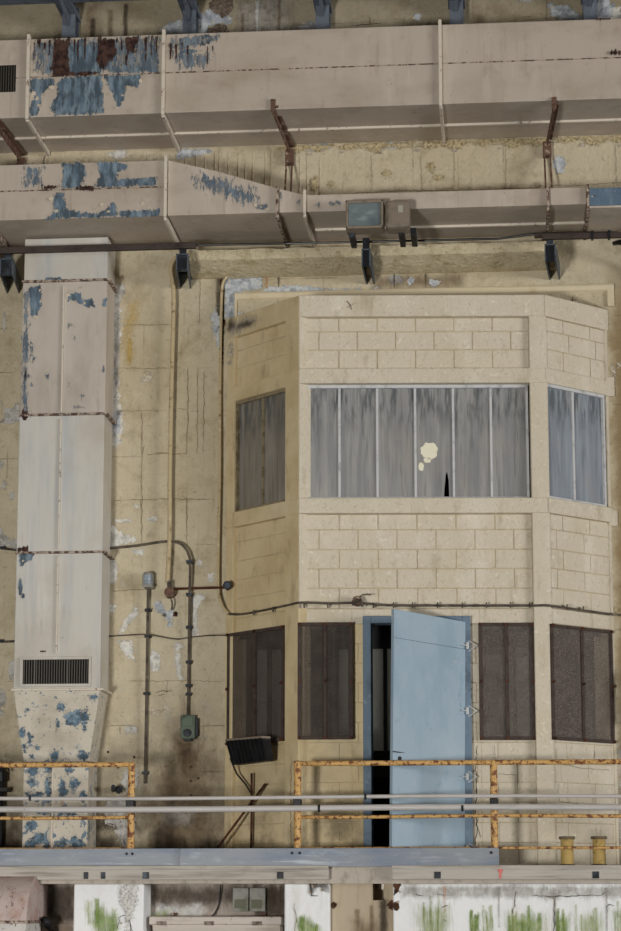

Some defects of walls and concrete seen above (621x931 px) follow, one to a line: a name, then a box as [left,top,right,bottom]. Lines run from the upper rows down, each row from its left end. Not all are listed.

rust [33,35,158,77]
peeling [29,0,234,117]
rust [169,42,213,63]
peeling [21,163,45,188]
peeling [44,150,160,221]
peeling [191,170,269,210]
peeling [0,277,61,425]
peeling [55,693,99,731]
peeling [18,726,87,848]
spalling [100,756,141,847]
leakage [444,886,528,906]
crack [512,892,614,931]